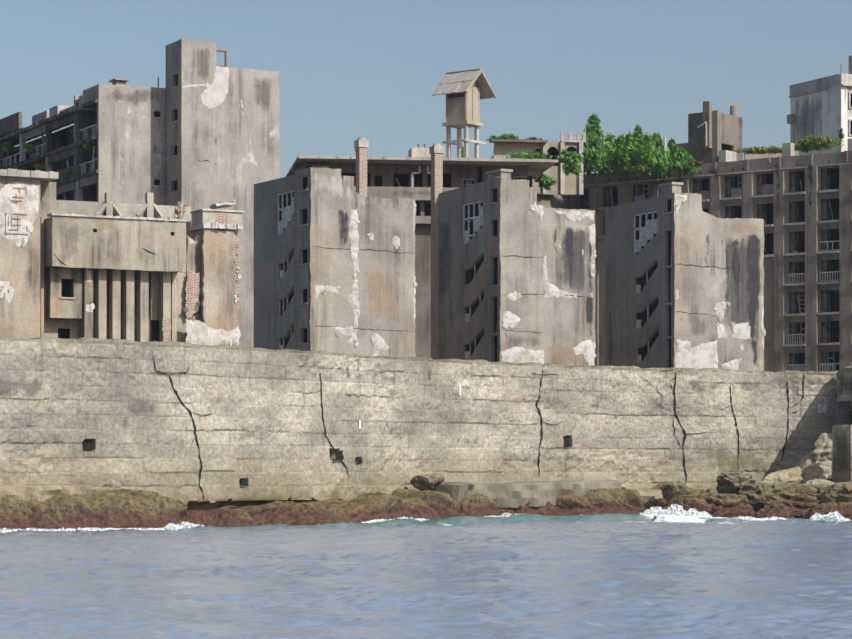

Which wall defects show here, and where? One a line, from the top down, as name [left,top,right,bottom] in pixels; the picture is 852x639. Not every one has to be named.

flaking render [182,66,229,109]
flaking render [0,182,39,248]
flaking render [162,317,171,341]
flaking render [183,236,242,347]
water stain [555,227,593,322]
flaking render [675,302,751,370]
water stain [725,235,760,363]
crack [152,352,213,497]
crack [297,373,349,475]
crack [531,373,563,474]
crack [642,372,716,481]
crack [718,387,739,470]